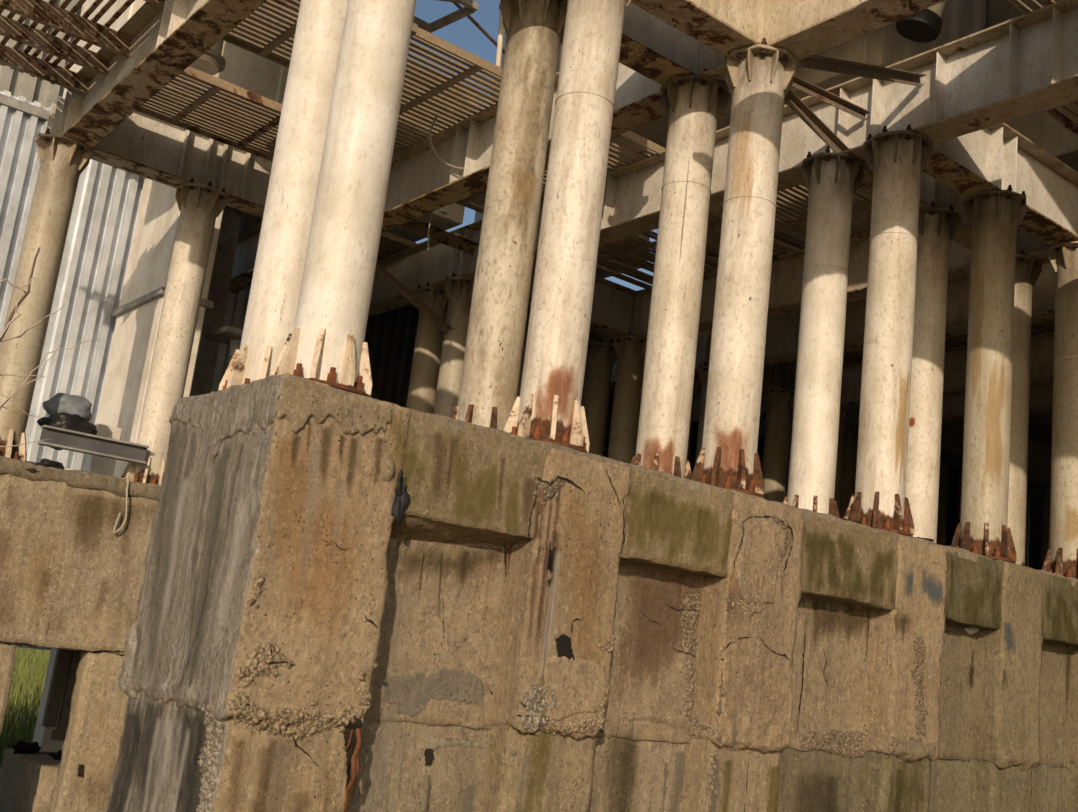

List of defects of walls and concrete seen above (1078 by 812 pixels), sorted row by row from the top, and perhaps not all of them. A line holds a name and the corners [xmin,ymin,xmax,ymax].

crack [504,475,584,574]
crack [605,468,625,555]
crack [732,516,794,592]
spalling [196,643,379,812]
peeling [514,634,616,737]
crack [674,619,827,735]